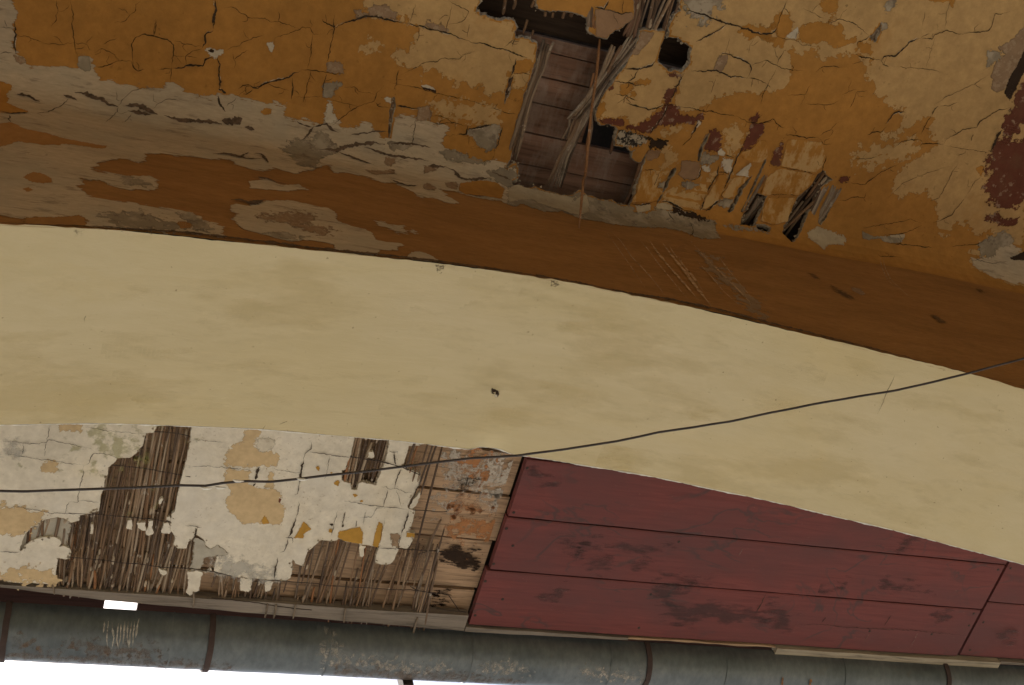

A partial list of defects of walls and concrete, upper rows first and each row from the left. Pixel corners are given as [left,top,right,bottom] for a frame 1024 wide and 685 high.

crack [1,0,530,147]
peeling [0,0,1024,286]
crack [633,148,742,234]
crack [615,0,1003,198]
crack [840,79,1007,264]
peeling [20,518,72,549]
crack [2,427,143,515]
peeling [190,538,229,571]
crack [193,440,349,577]
crack [331,451,419,549]
peeling [390,533,401,548]
damp [430,448,513,572]